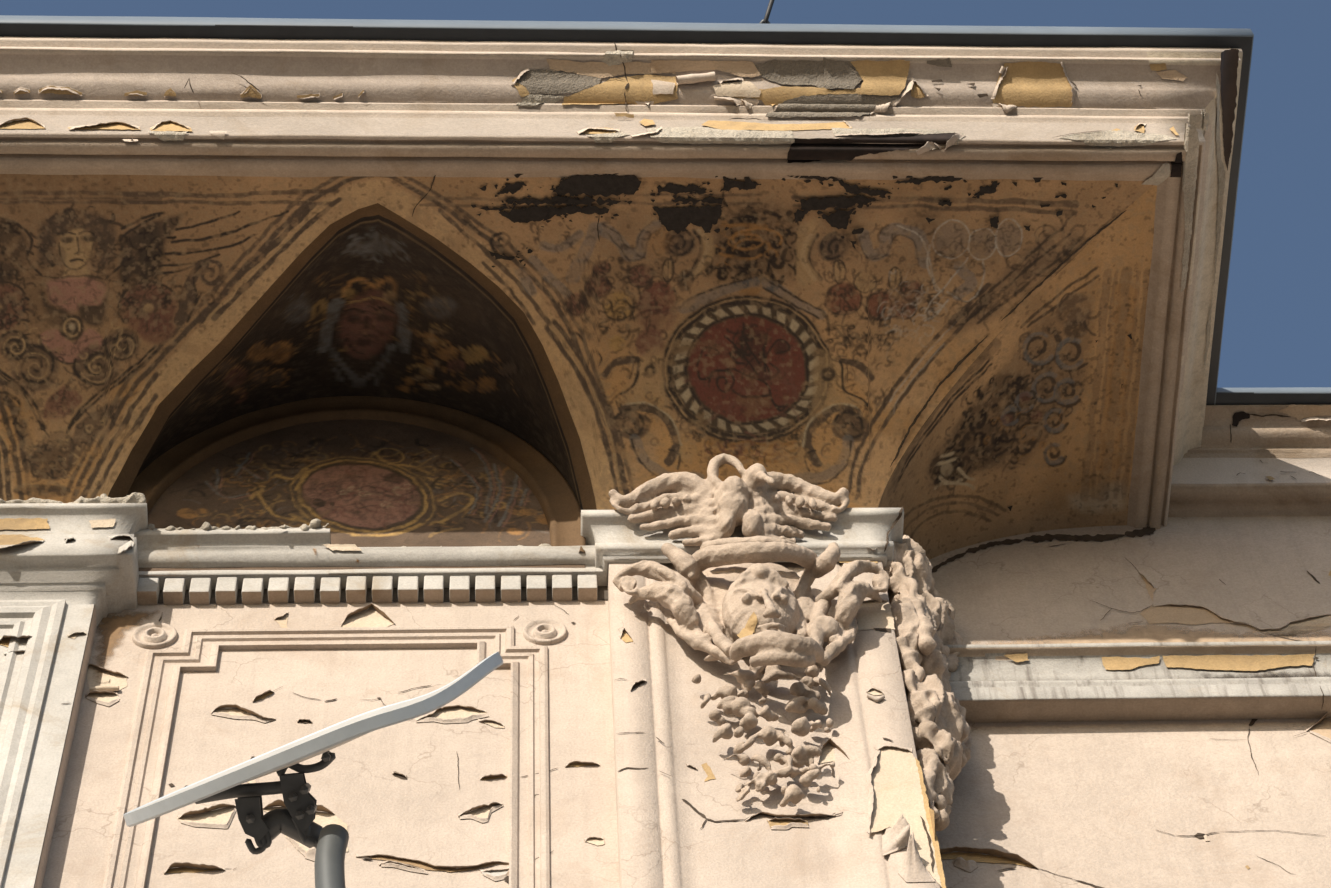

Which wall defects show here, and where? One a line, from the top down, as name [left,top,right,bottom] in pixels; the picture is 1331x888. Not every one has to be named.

spalling [968,61,1077,113]
peeling [0,117,46,129]
peeling [68,120,192,142]
spalling [471,50,1042,249]
spalling [1093,562,1331,671]
peeling [85,663,128,707]
peeling [415,705,504,728]
peeling [177,803,236,829]
peeling [313,805,348,831]
peeling [458,802,504,823]
spalling [866,738,1039,888]
crack [1039,868,1104,888]